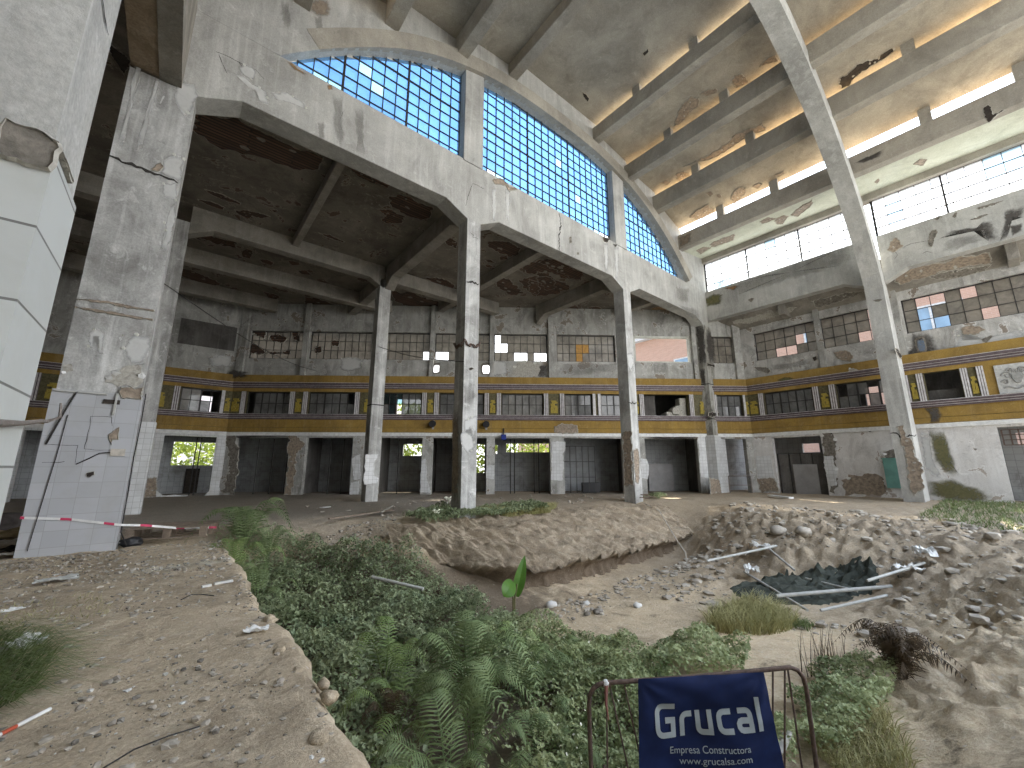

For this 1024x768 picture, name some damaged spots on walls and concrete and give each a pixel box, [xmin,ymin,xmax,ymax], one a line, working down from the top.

spalling [838,46,895,89]
spalling [0,118,74,184]
crack [110,155,178,183]
spalling [175,83,324,171]
spalling [347,166,434,224]
spalling [496,258,585,297]
spalling [894,252,993,285]
spalling [74,299,155,321]
spalling [222,435,240,495]
spalling [284,436,305,495]
flaking render [820,433,887,496]
spalling [883,425,925,495]